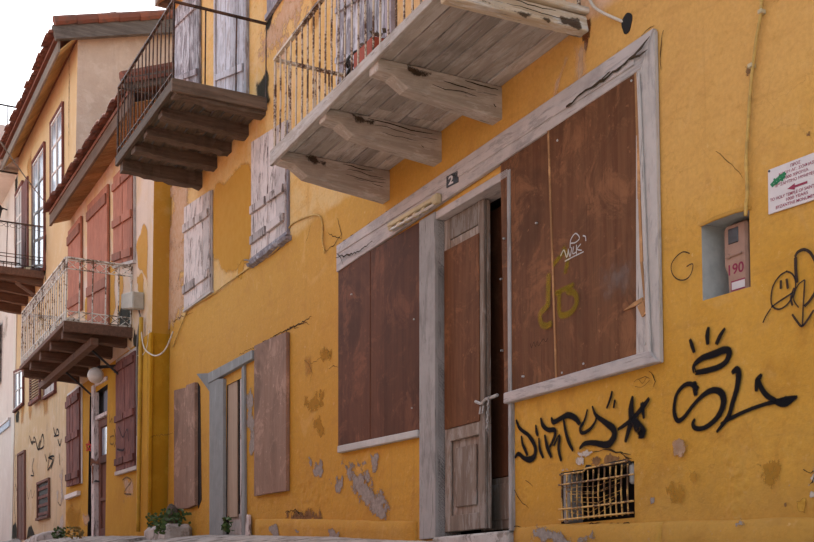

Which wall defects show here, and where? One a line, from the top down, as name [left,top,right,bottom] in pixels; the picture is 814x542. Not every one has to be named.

peeling [168,185,190,330]
crack [307,211,387,261]
crack [239,316,311,355]
flaking render [304,389,325,438]
flaking render [308,457,323,477]
flaking render [331,453,390,519]
spalling [533,449,634,542]